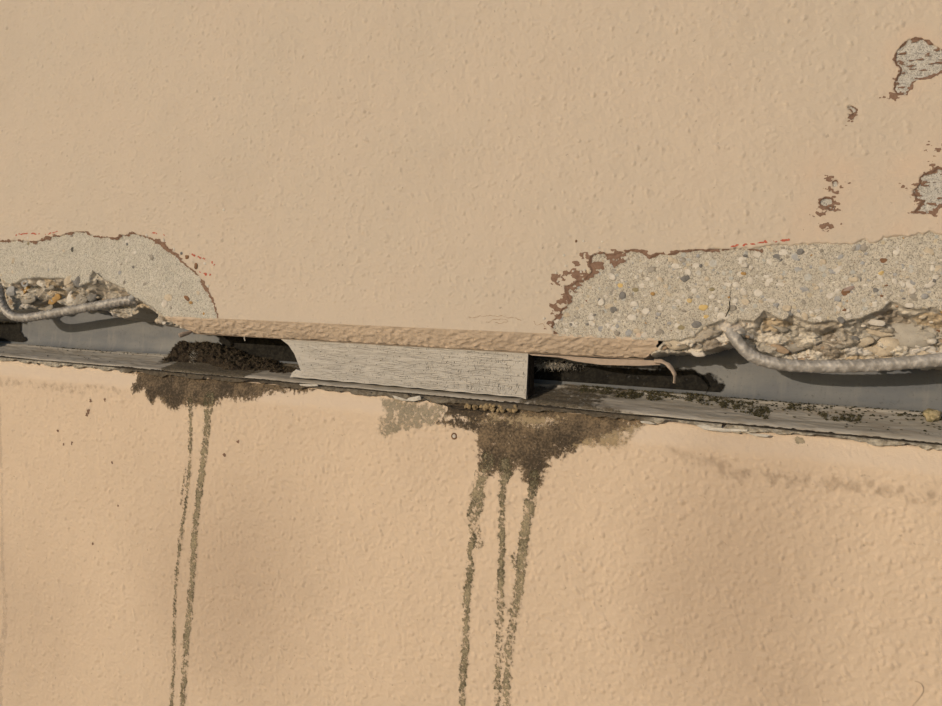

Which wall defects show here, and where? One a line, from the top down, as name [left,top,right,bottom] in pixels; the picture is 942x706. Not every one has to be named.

peeling [879,37,942,101]
peeling [899,141,942,217]
spalling [0,231,218,338]
spalling [530,175,942,384]
spalling [0,357,942,450]
damp [131,372,315,706]
damp [380,399,643,706]